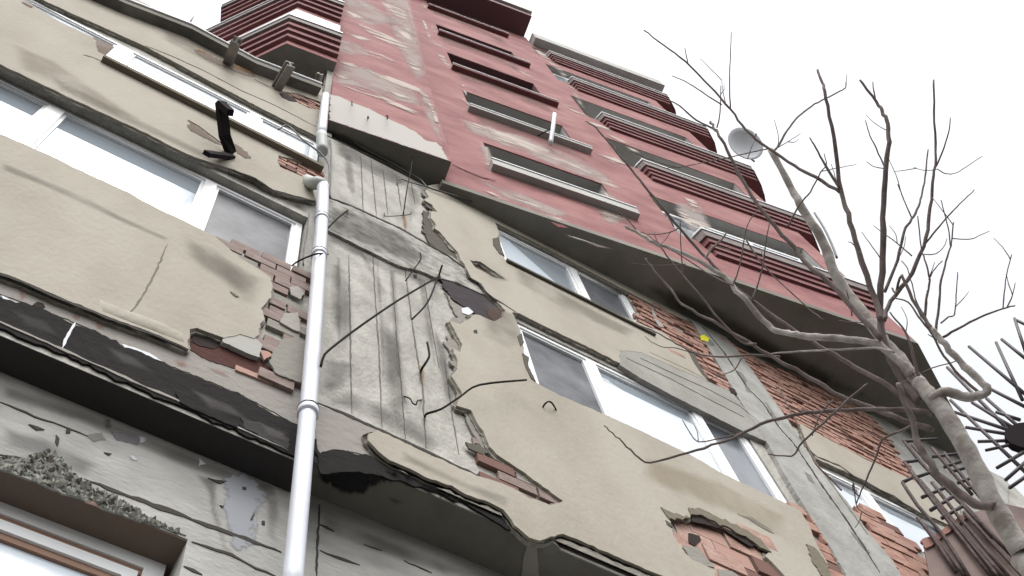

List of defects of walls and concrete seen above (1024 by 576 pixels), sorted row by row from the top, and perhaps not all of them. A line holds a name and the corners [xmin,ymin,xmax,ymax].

peeling [279,0,451,162]
flaking render [278,157,325,179]
spalling [421,192,461,263]
spalling [493,237,505,257]
crack [0,246,187,351]
flaking render [189,236,311,394]
spalling [439,279,502,324]
spalling [517,333,536,382]
flaking render [628,294,916,482]
flaking render [464,413,560,505]
flaking render [660,507,781,576]
flaking render [850,503,929,576]